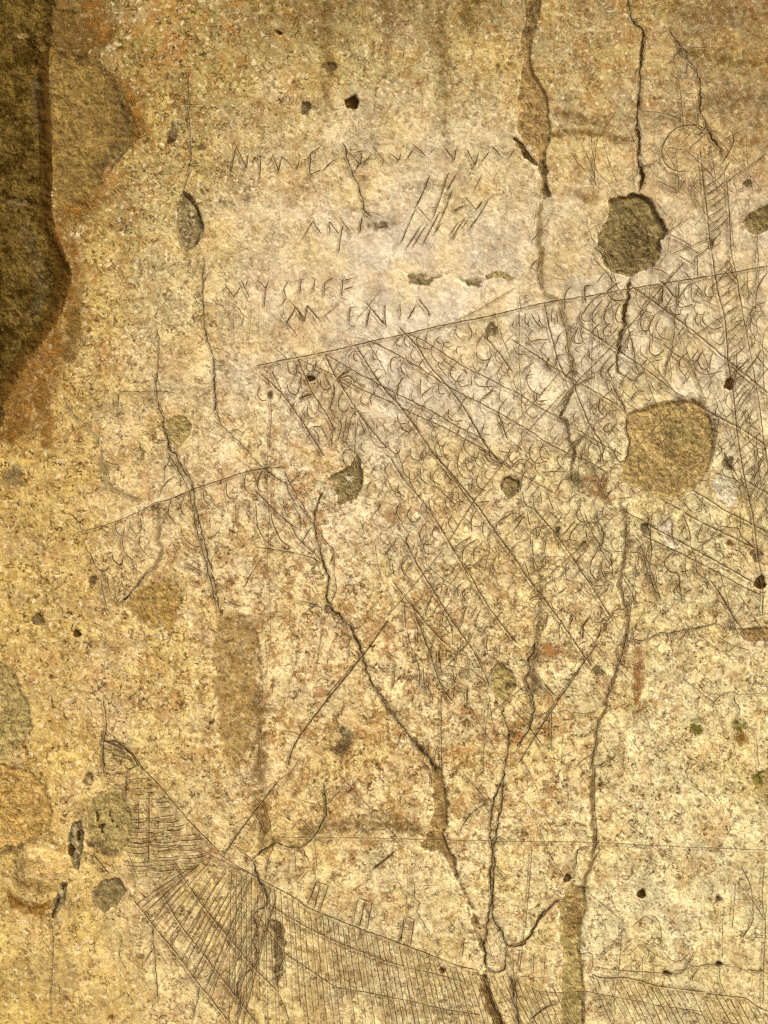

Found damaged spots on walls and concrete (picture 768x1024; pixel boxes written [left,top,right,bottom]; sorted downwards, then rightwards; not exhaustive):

water stain [50,0,85,55]
spalling [176,192,204,251]
spalling [597,193,668,277]
spalling [743,205,768,235]
crack [118,322,244,609]
spalling [328,454,363,506]
crack [193,0,768,1024]
crack [117,926,173,1002]